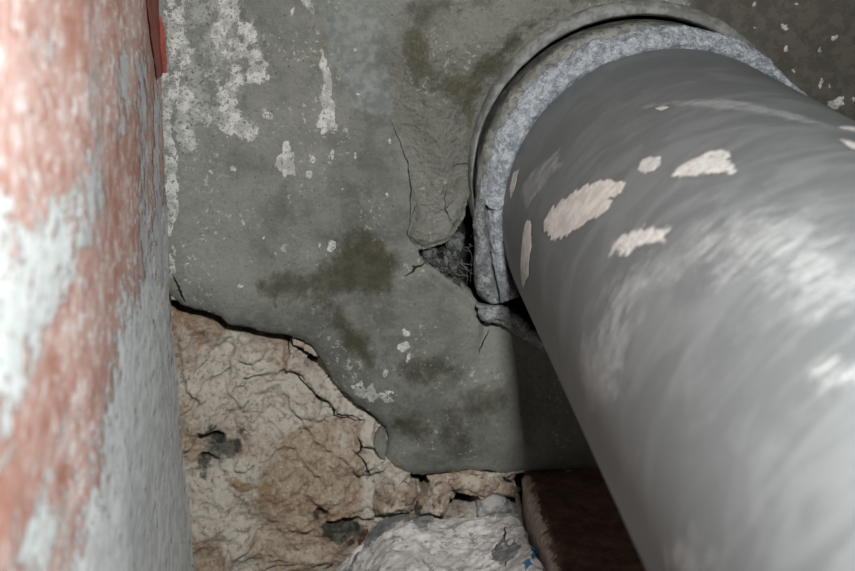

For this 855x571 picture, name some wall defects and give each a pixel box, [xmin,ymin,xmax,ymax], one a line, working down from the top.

water stain [404,29,520,123]
spalling [0,0,530,571]
water stain [260,232,396,299]
crack [390,120,426,276]